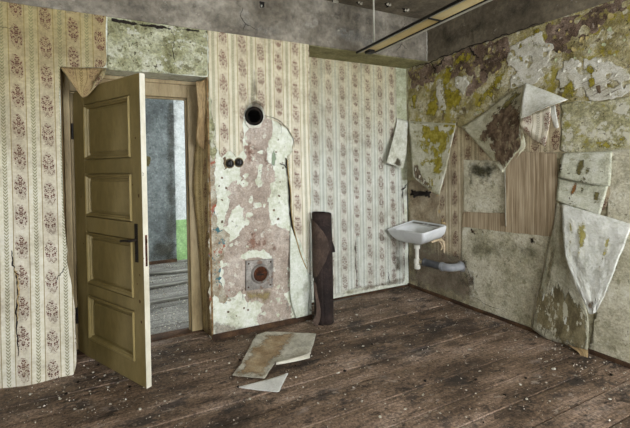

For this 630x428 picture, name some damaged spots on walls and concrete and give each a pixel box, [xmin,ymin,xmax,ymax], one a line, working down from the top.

peeling [396,0,630,128]
peeling [207,97,293,325]
leakage [536,254,587,349]